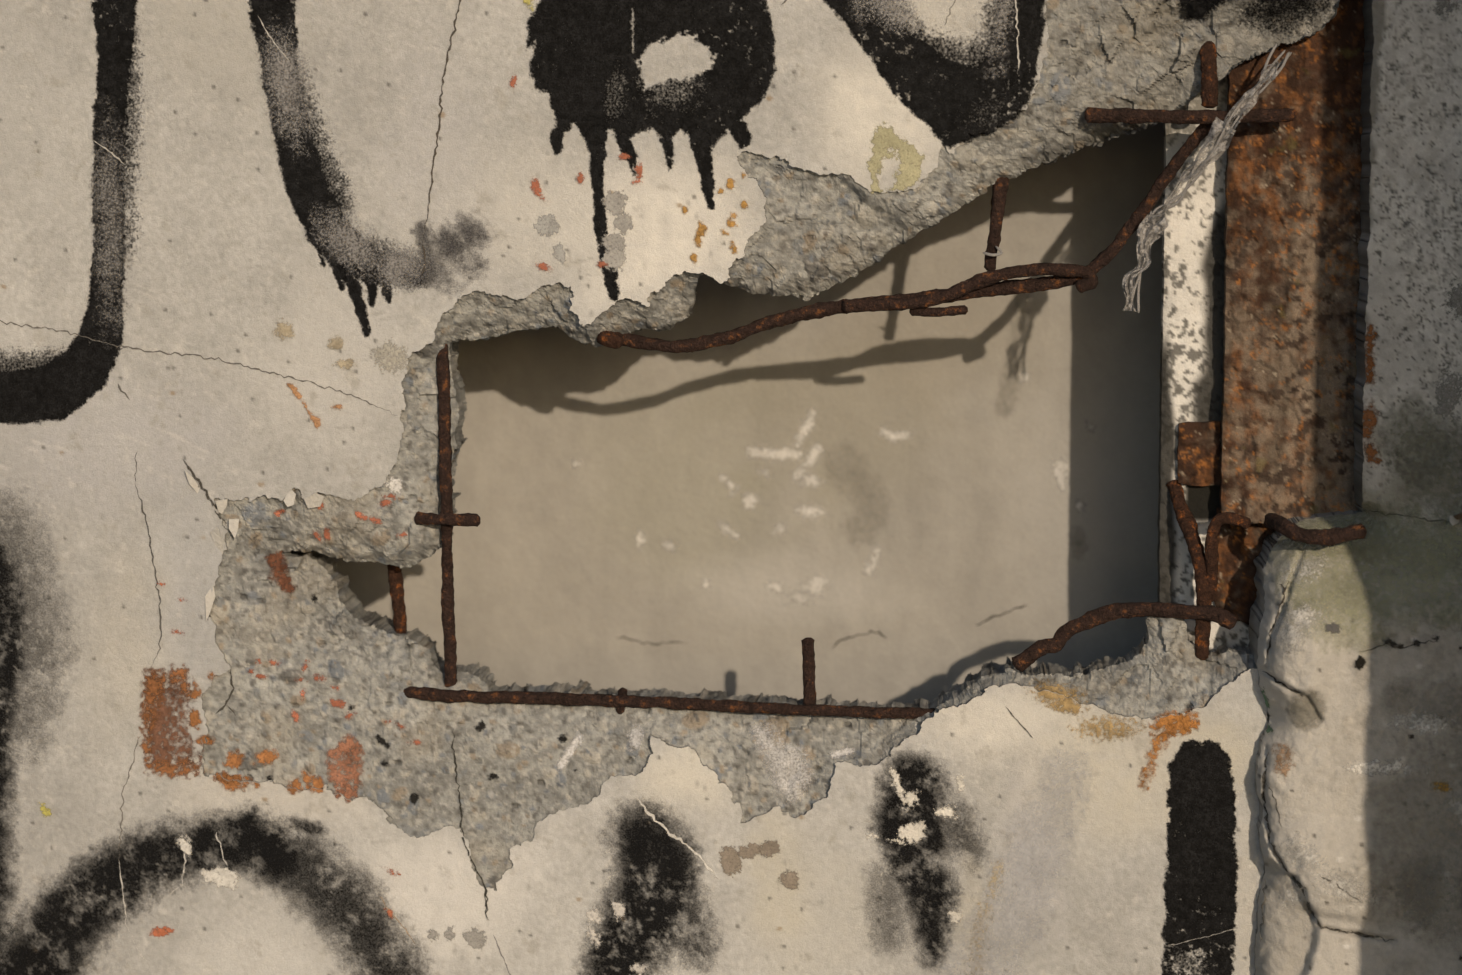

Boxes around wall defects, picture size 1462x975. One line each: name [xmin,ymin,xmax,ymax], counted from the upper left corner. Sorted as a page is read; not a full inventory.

crack [421,0,461,275]
rust [683,173,748,262]
crack [0,320,403,419]
peeling [185,470,200,493]
spalling [201,0,1367,891]
crack [1263,582,1303,697]
crack [1363,640,1436,652]
rust [139,668,279,791]
crack [1259,752,1394,941]
peeling [1283,831,1376,903]
peeling [947,910,964,924]